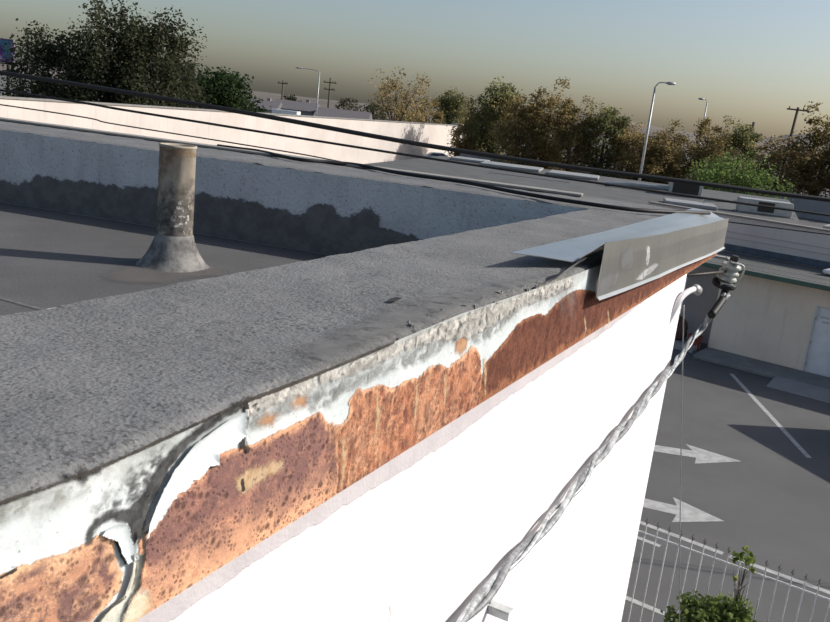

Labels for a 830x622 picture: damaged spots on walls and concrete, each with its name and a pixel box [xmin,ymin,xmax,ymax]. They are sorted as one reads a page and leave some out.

leakage [0,175,158,227]
leakage [193,192,423,255]
flaking render [101,278,644,622]
rust [130,253,717,621]
rust [0,535,124,622]